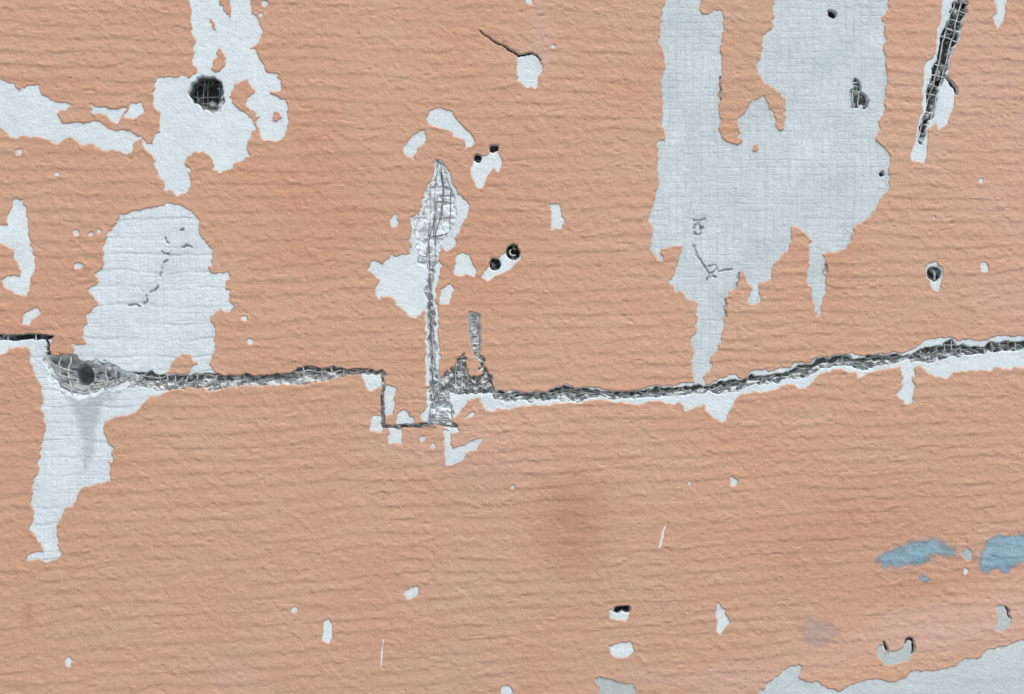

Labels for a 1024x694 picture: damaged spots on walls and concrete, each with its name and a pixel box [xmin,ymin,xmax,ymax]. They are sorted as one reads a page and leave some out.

crack [479,31,541,61]
peeling [403,108,475,160]
peeling [0,0,289,376]
peeling [471,152,502,188]
peeling [648,0,891,394]
peeling [361,159,521,465]
crack [0,334,1024,429]
peeling [25,341,169,562]
peeling [595,677,636,694]
peeling [609,642,634,658]
peeling [759,637,1024,694]